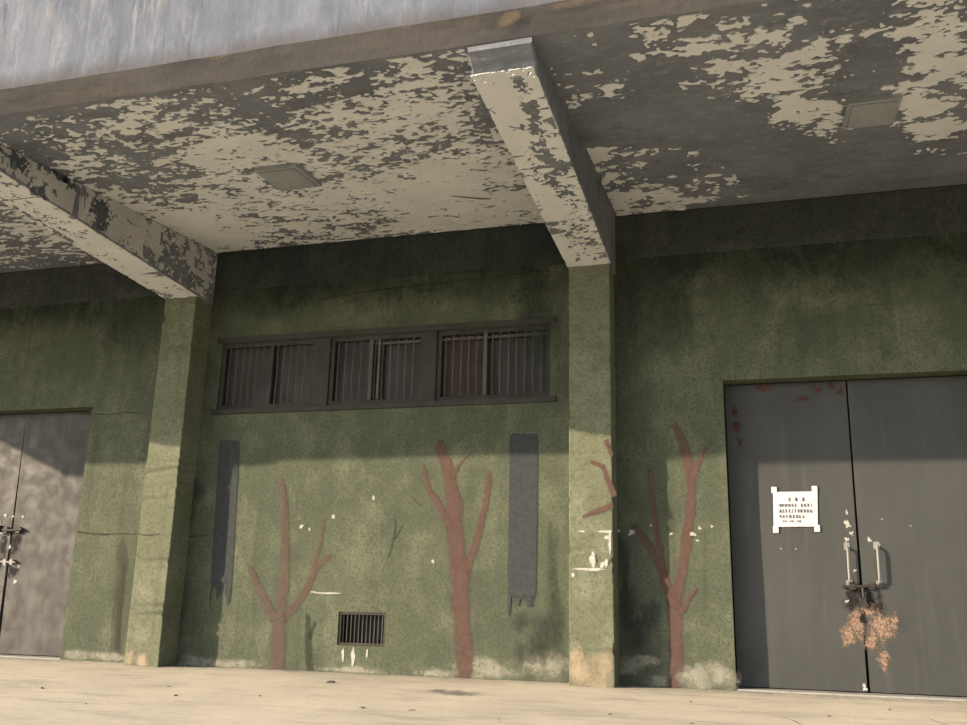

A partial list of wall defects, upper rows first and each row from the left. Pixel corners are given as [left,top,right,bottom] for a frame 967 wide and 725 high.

peeling [550,66,635,109]
peeling [627,0,967,155]
peeling [0,49,610,299]
peeling [587,146,748,216]
crack [77,529,158,537]
rust [839,603,899,674]